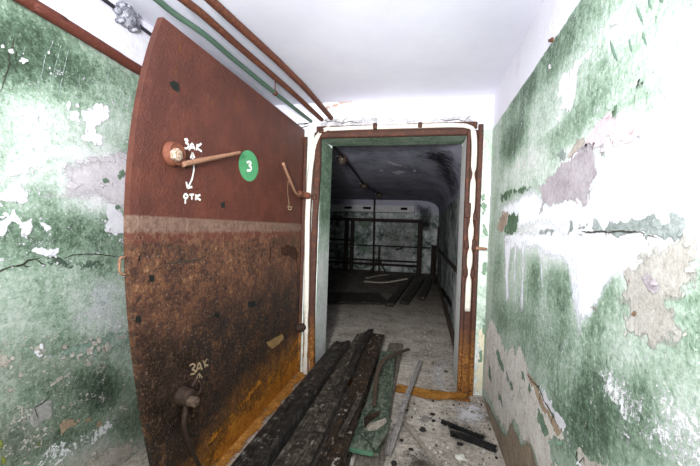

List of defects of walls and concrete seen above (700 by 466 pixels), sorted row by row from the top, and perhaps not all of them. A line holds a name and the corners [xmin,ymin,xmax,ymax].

peeling [0,177,62,266]
crack [0,253,120,272]
peeling [67,92,114,146]
flaking render [58,141,128,245]
flaking render [500,105,640,215]
crack [568,229,662,241]
peeling [570,212,697,349]
corrosion [398,383,469,400]
peeling [474,319,608,466]